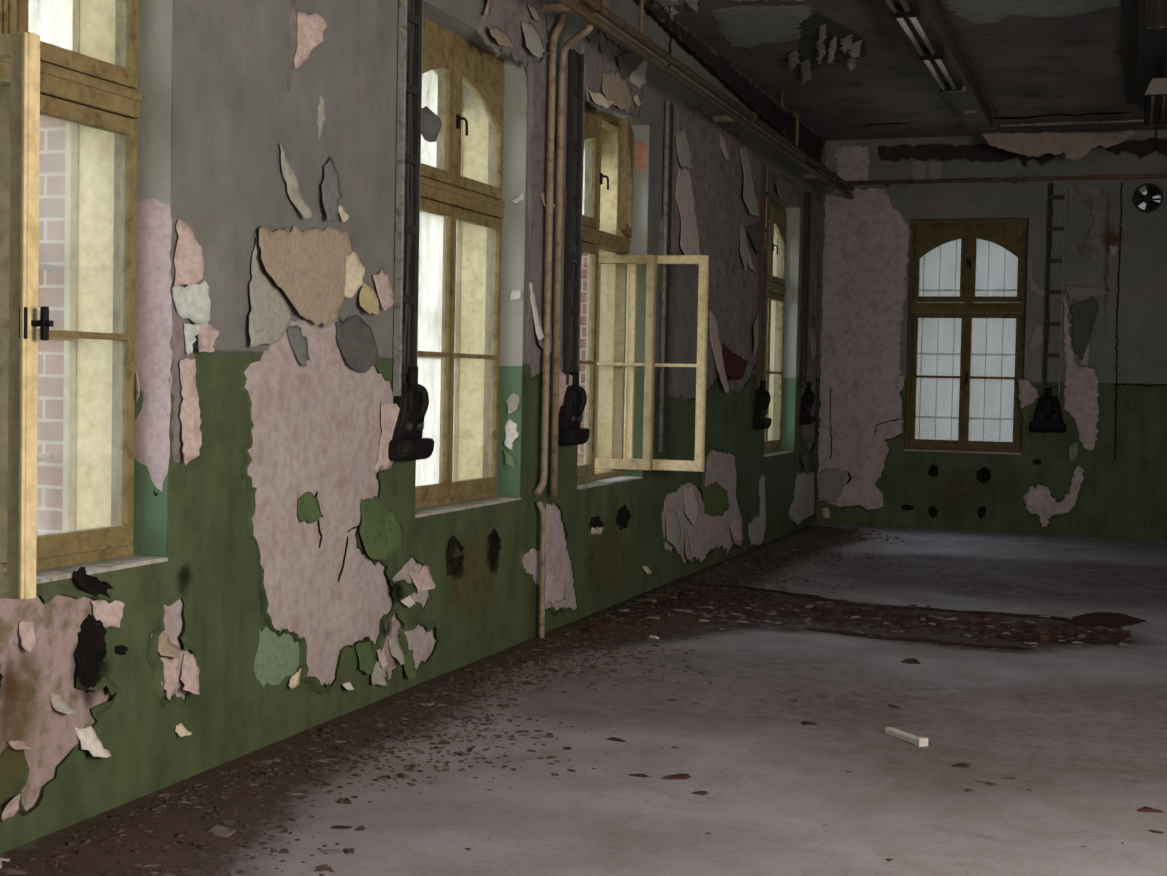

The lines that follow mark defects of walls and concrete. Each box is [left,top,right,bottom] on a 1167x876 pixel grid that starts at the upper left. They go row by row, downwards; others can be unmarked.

spalling [0,567,125,822]
peeling [146,593,200,708]
peeling [134,199,219,496]
spalling [239,143,439,695]
peeling [503,393,520,468]
spalling [477,0,572,418]
spalling [518,498,579,616]
spalling [655,103,765,403]
spalling [661,447,767,565]
spalling [788,146,912,527]
peeling [982,130,1136,160]
spalling [1020,288,1102,528]